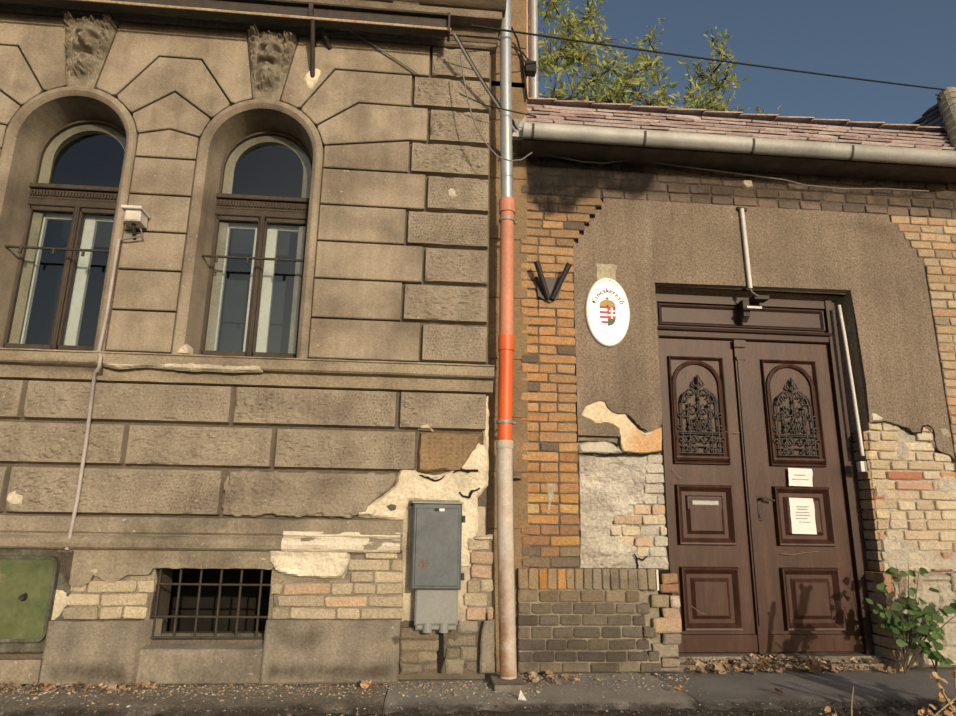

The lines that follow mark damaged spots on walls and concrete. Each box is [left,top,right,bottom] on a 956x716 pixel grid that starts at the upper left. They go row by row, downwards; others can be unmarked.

flaking render [51,569,157,620]
flaking render [269,551,404,622]
flaking render [358,396,495,673]
flaking render [577,401,682,672]
flaking render [852,413,956,671]